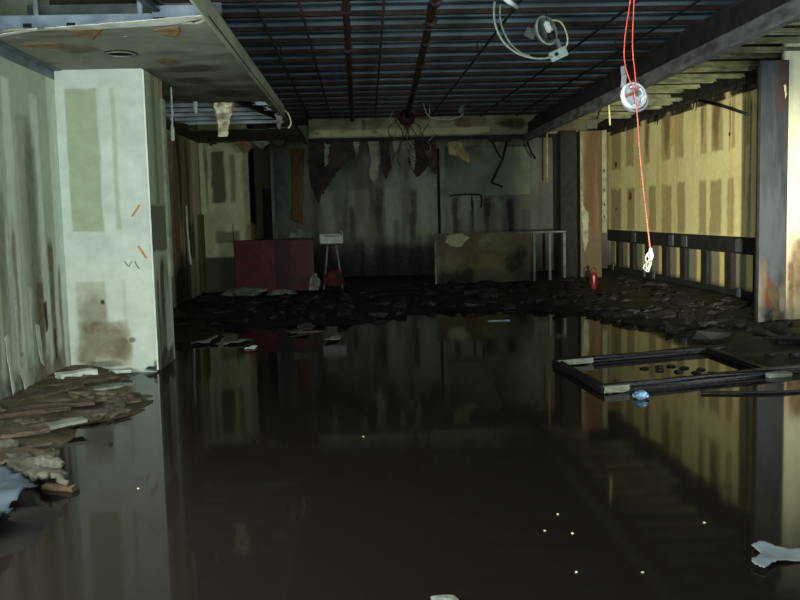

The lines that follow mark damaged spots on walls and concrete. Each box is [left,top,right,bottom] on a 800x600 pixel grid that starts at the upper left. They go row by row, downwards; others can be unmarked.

water stain [610,82,757,136]
water stain [28,245,61,356]